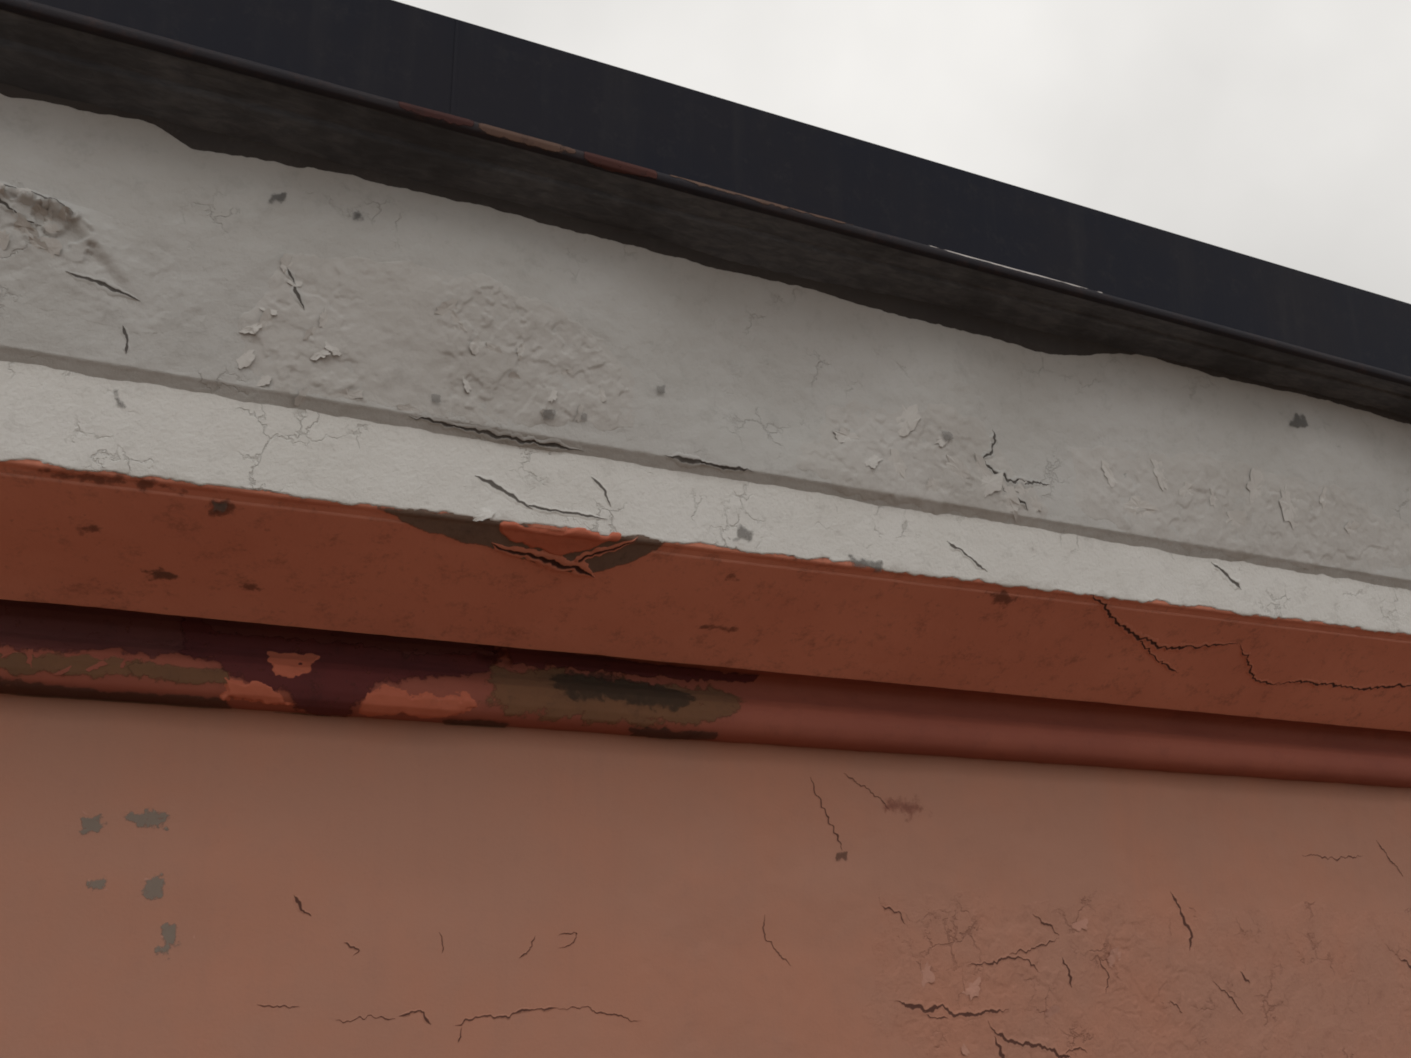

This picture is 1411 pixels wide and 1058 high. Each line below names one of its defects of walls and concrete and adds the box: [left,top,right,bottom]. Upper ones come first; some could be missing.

peeling [236,253,636,431]
crack [410,415,611,520]
spalling [378,507,664,577]
peeling [0,599,759,728]
crack [1091,595,1411,693]
peeling [126,809,168,831]
crack [810,773,889,849]
peeling [142,874,165,900]
crack [293,895,311,916]
crack [969,915,1110,994]
crack [338,1005,639,1042]
crack [896,999,1087,1058]